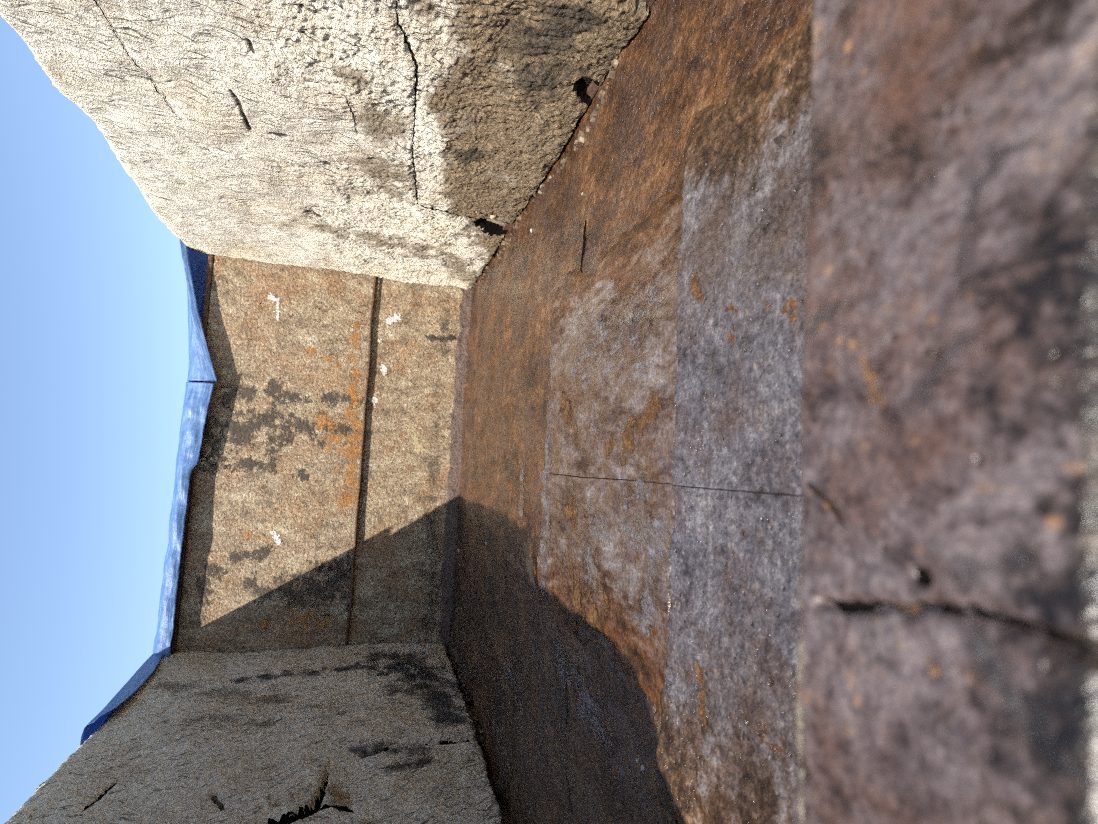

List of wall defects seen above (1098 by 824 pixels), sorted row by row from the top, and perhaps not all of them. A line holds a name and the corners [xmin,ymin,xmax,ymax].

crack [395,0,496,219]
rust [307,322,363,514]
rust [605,387,667,465]
crack [546,473,844,526]
rust [561,560,611,637]
crack [824,598,1098,652]
crack [82,783,116,812]
crack [238,774,353,824]